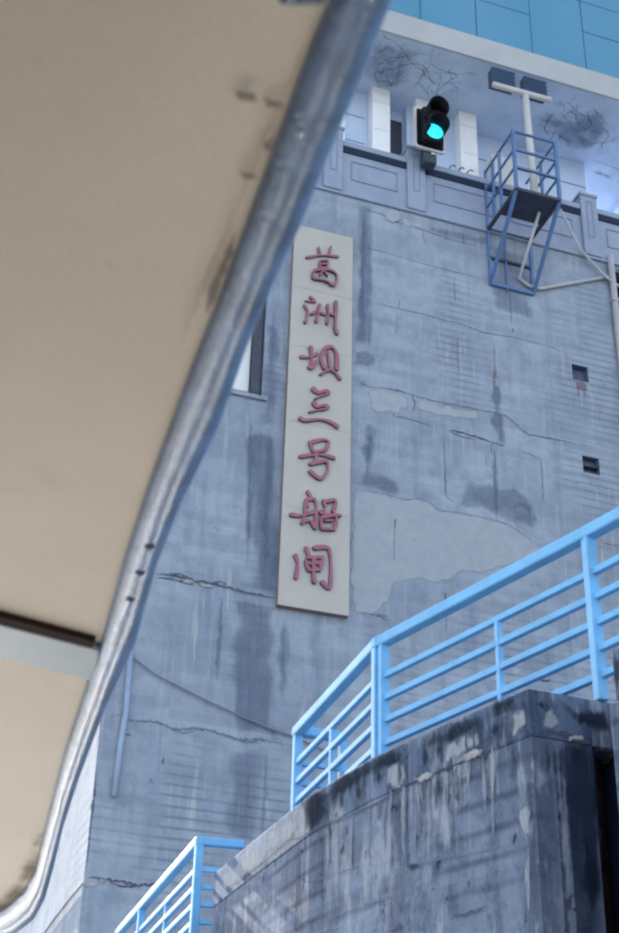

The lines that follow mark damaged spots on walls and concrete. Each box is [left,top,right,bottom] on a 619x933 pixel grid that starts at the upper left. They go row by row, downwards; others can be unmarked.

crack [368,386,586,503]
crack [155,573,276,598]
crack [125,718,283,745]
damp [545,711,558,728]
damp [570,710,608,730]
damp [222,698,525,889]
crack [83,770,156,888]
damp [519,807,530,834]
damp [546,746,600,933]